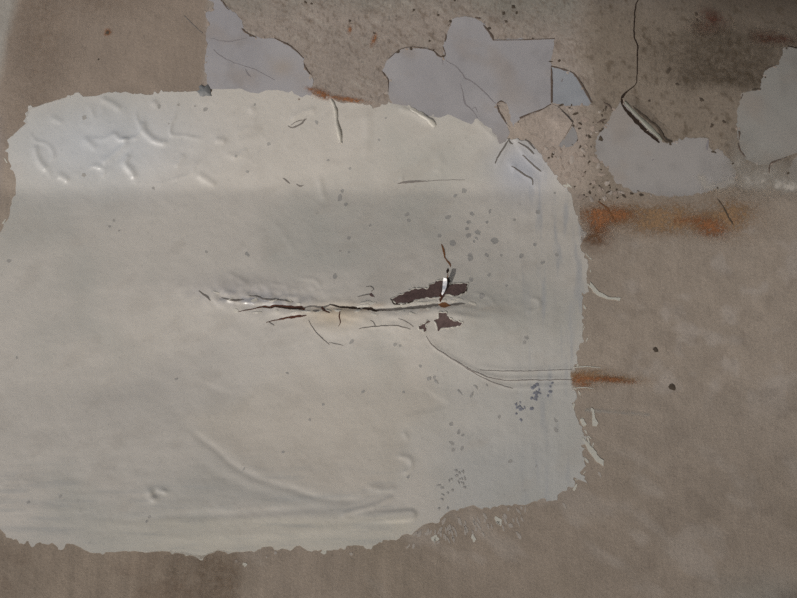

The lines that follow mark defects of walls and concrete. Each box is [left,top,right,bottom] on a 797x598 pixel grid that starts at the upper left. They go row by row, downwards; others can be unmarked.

peeling [204,0,313,100]
rust [309,88,360,102]
peeling [382,16,738,202]
crack [620,0,671,144]
peeling [736,47,797,182]
rust [586,201,749,244]
crack [441,244,451,278]
crack [199,286,477,346]
rust [570,366,633,389]